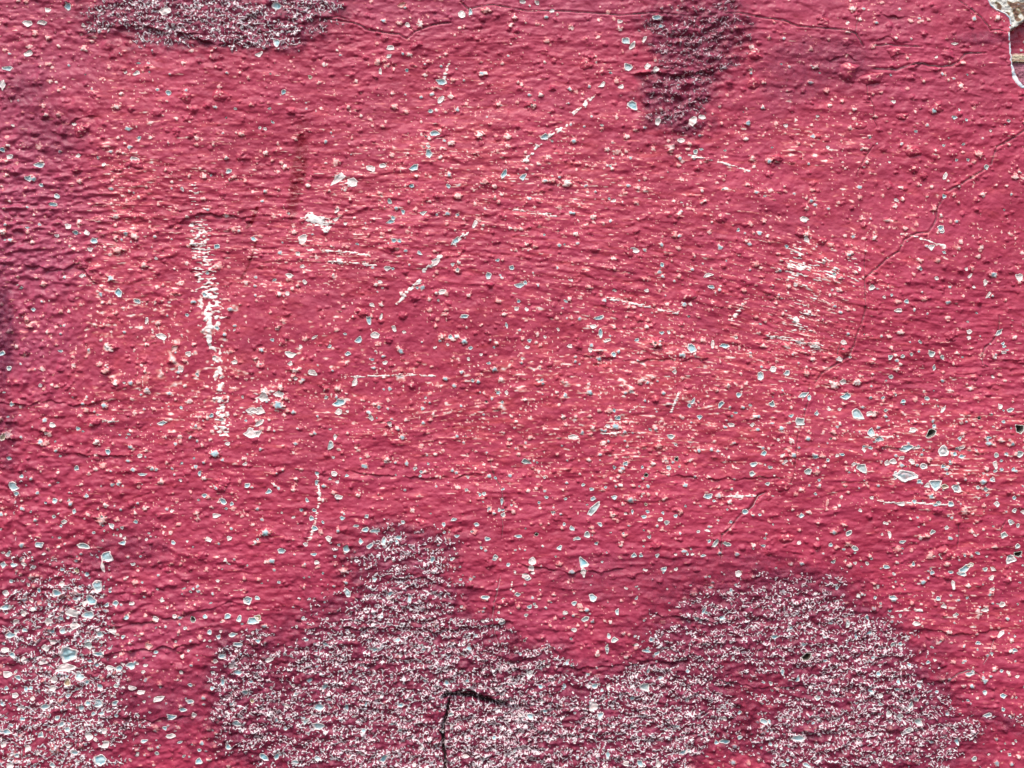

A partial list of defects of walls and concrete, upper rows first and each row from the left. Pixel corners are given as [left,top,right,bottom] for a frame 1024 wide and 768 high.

peeling [64,0,344,58]
peeling [622,0,755,155]
peeling [888,340,944,371]
peeling [465,476,513,517]
peeling [0,483,1024,768]
crack [440,690,514,768]